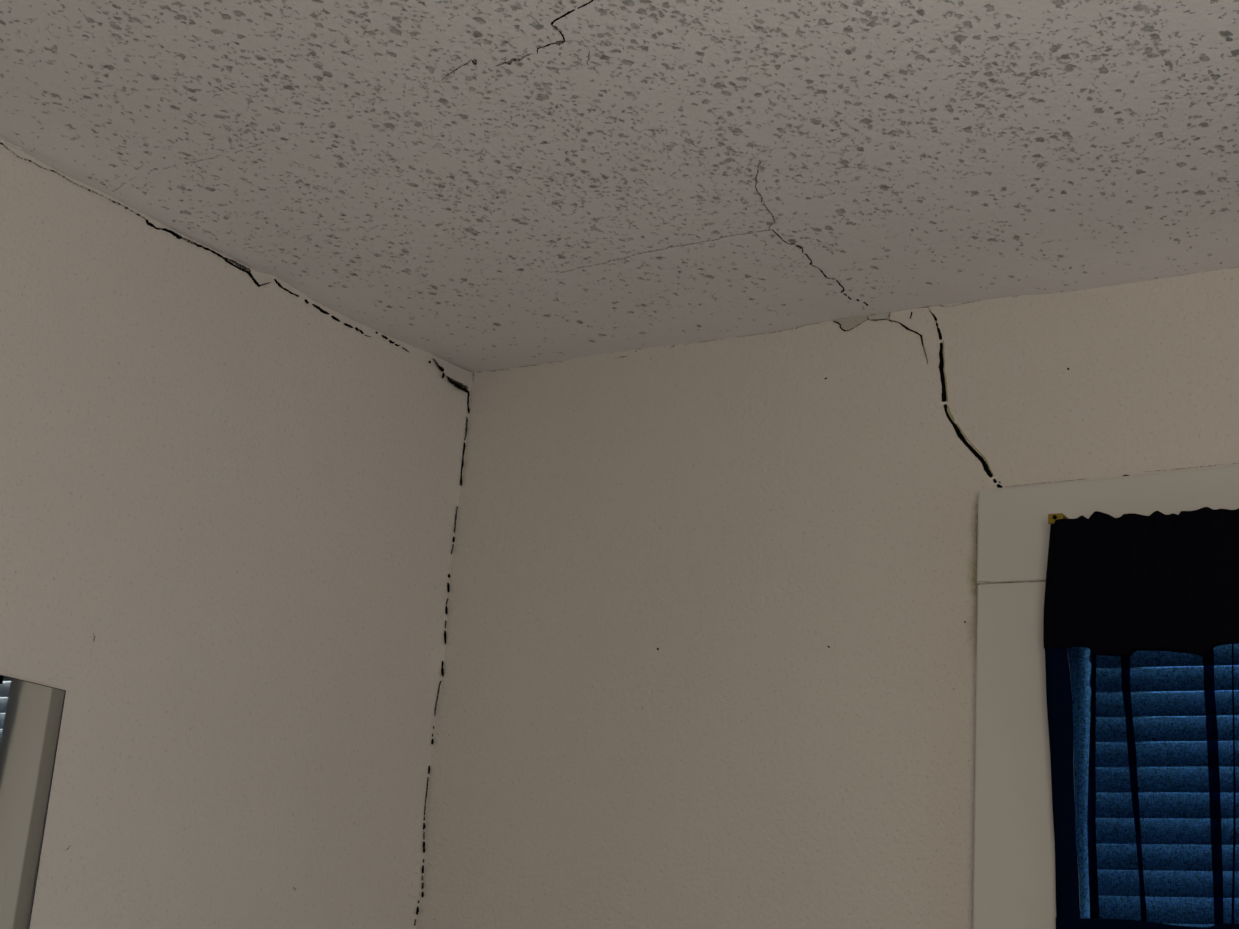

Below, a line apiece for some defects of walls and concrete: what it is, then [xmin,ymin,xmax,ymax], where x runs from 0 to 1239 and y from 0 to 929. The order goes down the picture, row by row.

crack [443,0,593,79]
crack [560,162,1082,488]
crack [0,142,553,925]